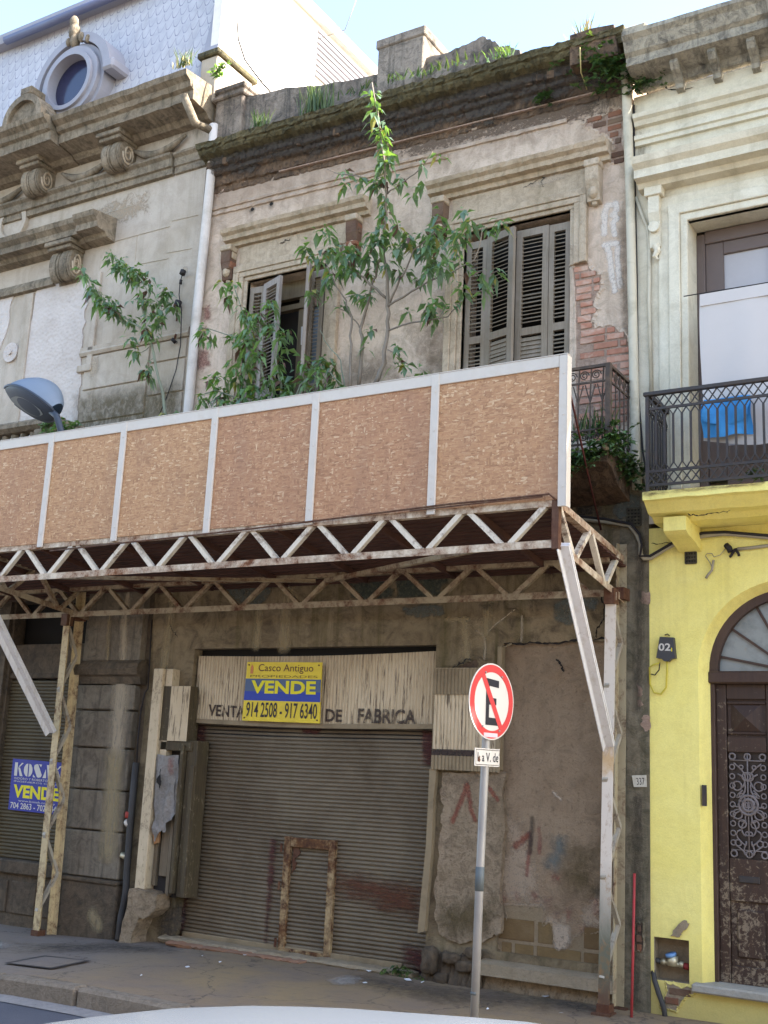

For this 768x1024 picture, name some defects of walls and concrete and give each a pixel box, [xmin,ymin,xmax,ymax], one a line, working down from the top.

leakage [209,63,620,175]
peeling [401,100,624,167]
spalling [569,257,640,446]
crack [452,597,605,668]
spalling [658,980,697,1013]